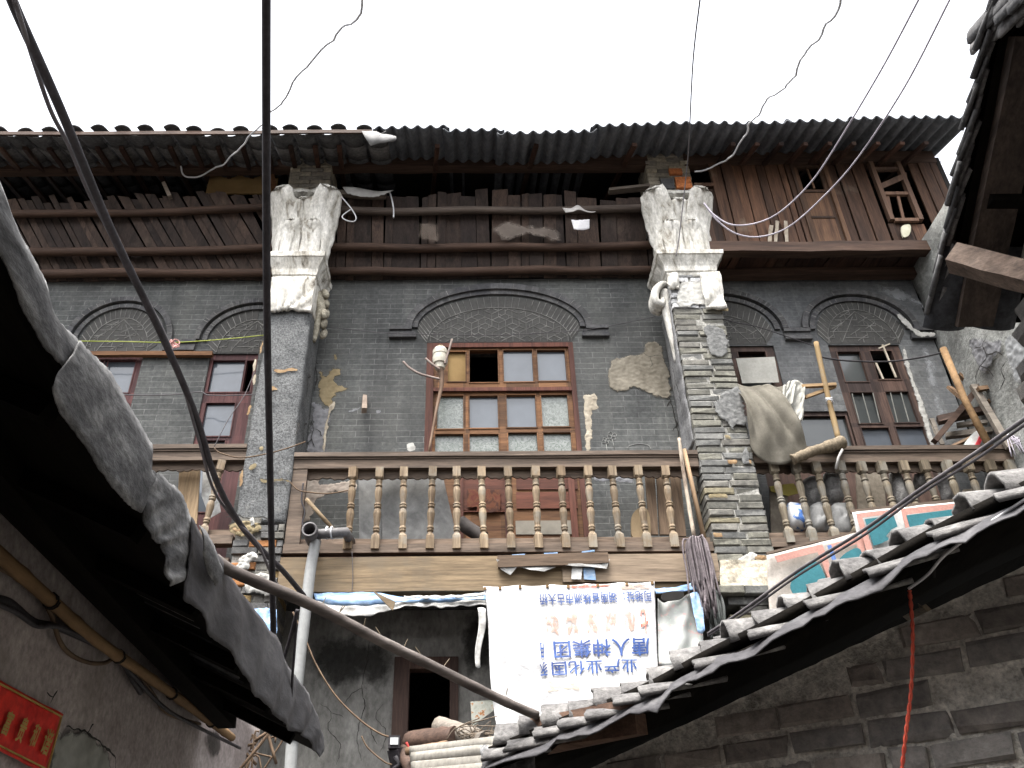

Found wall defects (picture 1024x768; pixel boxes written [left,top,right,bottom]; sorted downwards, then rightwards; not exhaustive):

crack [974,336,1006,391]
peeling [306,354,348,452]
peeling [583,393,599,451]
peeling [51,731,110,768]